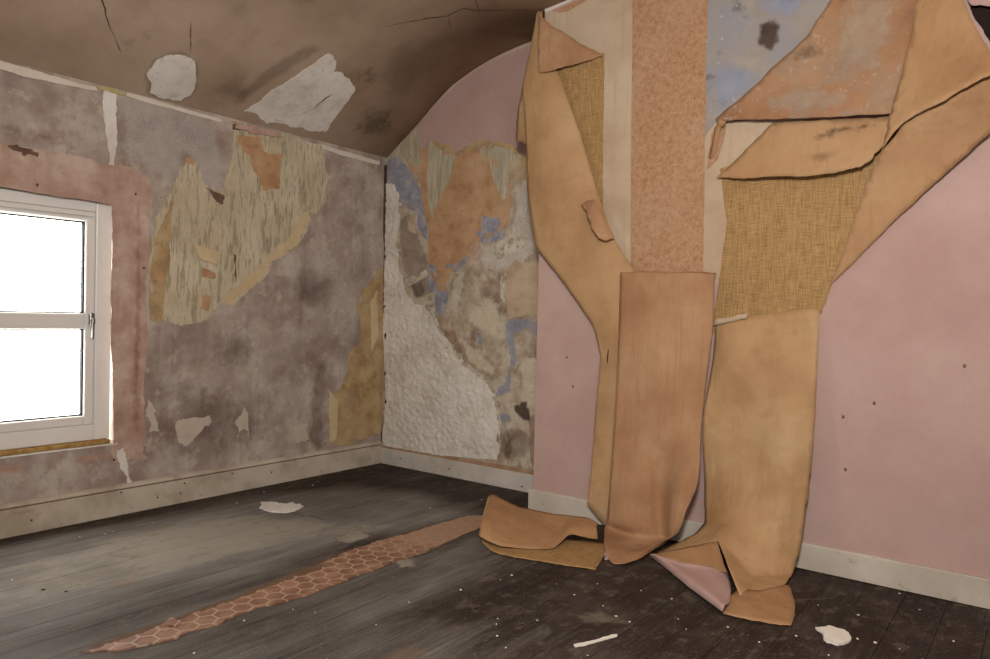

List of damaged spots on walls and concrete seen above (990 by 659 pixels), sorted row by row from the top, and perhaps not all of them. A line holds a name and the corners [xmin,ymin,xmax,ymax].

crack [101,0,121,52]
crack [381,0,525,28]
peeling [968,2,990,41]
peeling [546,0,898,334]
flaking render [0,144,159,462]
flaking render [370,156,537,460]
peeling [175,416,212,446]
peeling [235,408,249,437]